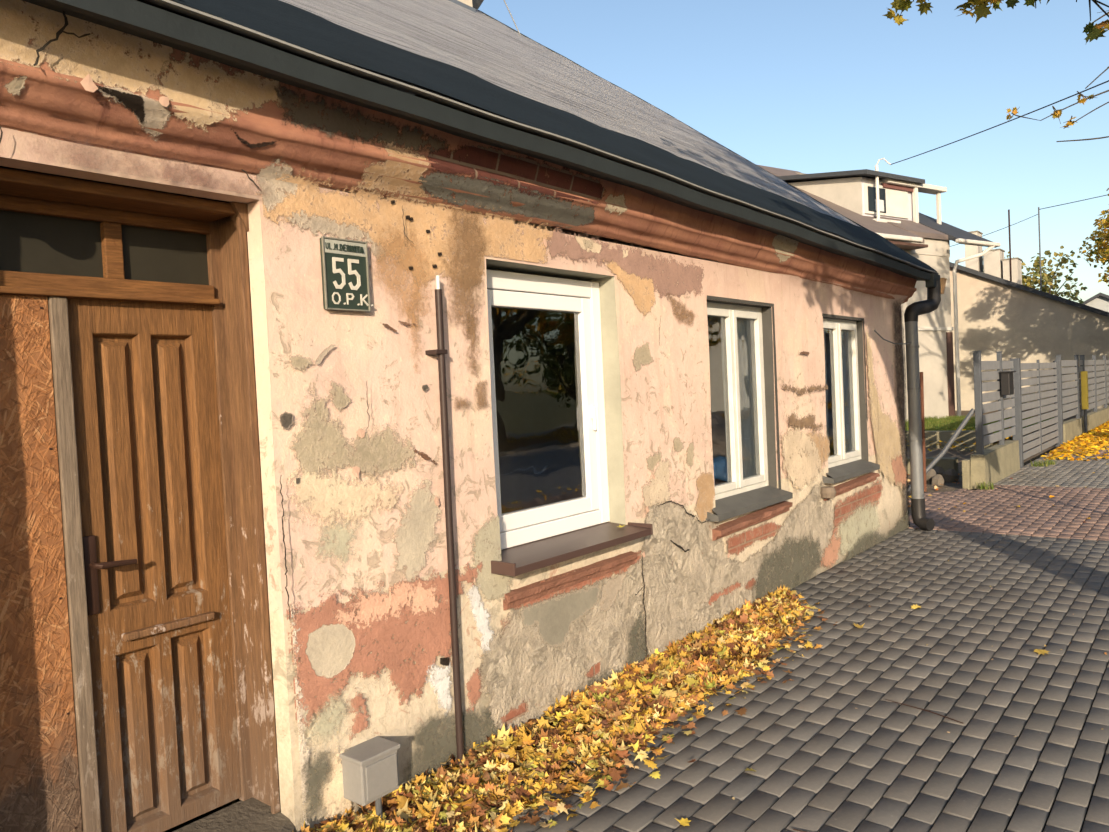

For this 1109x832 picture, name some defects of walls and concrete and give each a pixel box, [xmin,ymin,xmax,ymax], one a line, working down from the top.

crack [33,11,91,66]
flaking render [0,0,627,285]
peeling [289,354,313,371]
flaking render [575,236,656,315]
peeling [280,381,448,630]
flaking render [471,331,907,732]